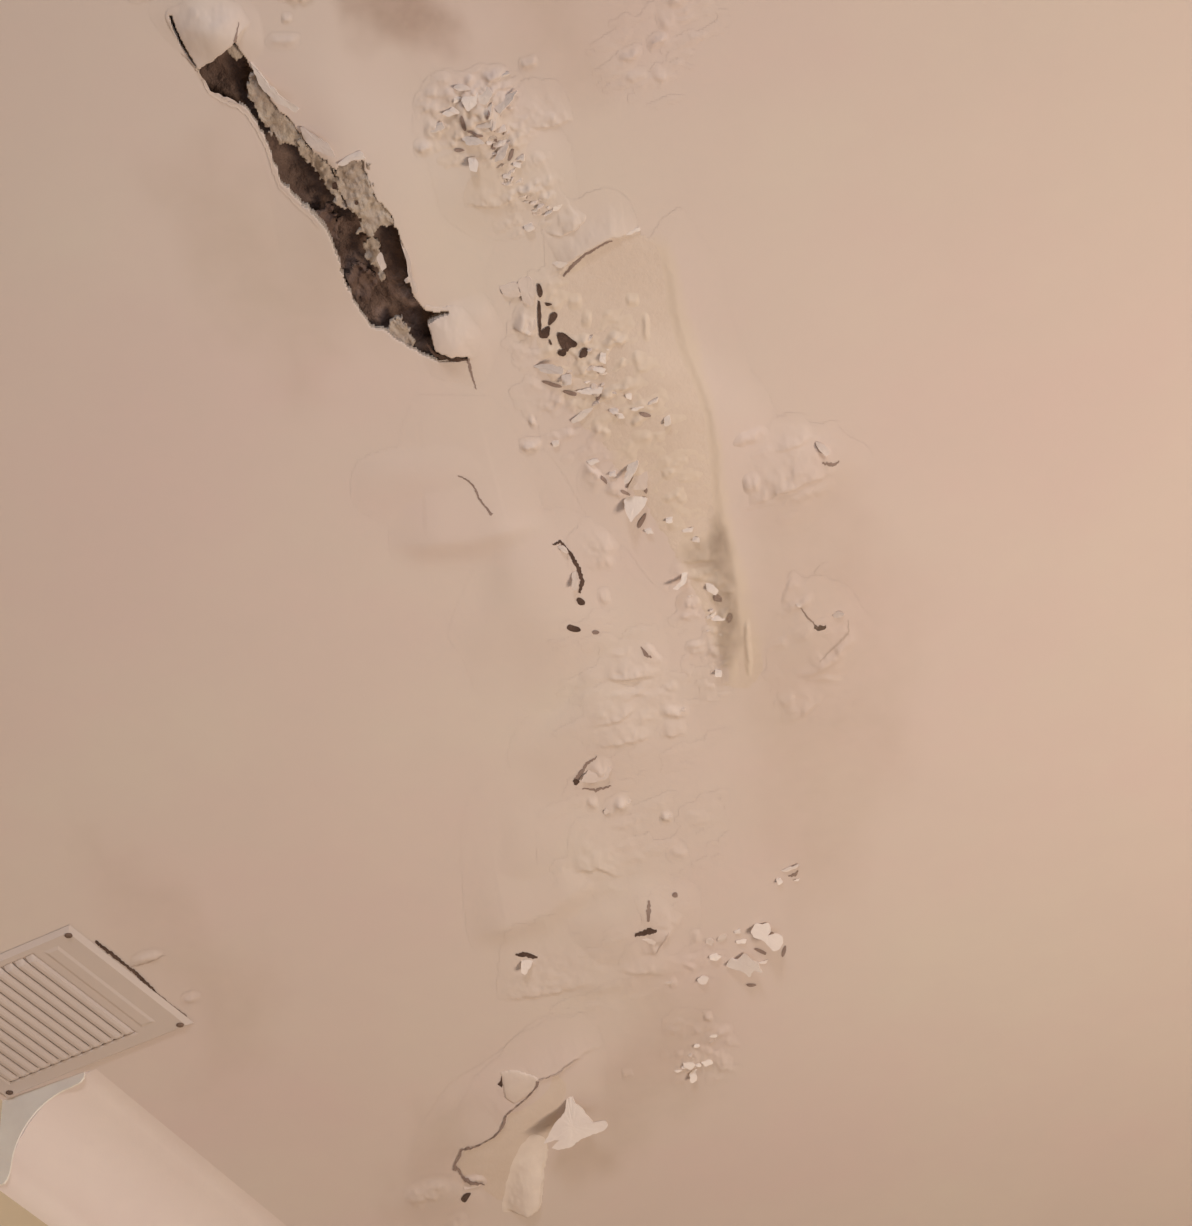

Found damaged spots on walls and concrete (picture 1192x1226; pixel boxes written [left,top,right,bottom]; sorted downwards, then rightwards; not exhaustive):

crack [426,343,476,389]
peeling [413,53,787,701]
peeling [581,766,612,783]
peeling [515,952,538,975]
peeling [705,923,786,987]
peeling [403,1012,608,1226]